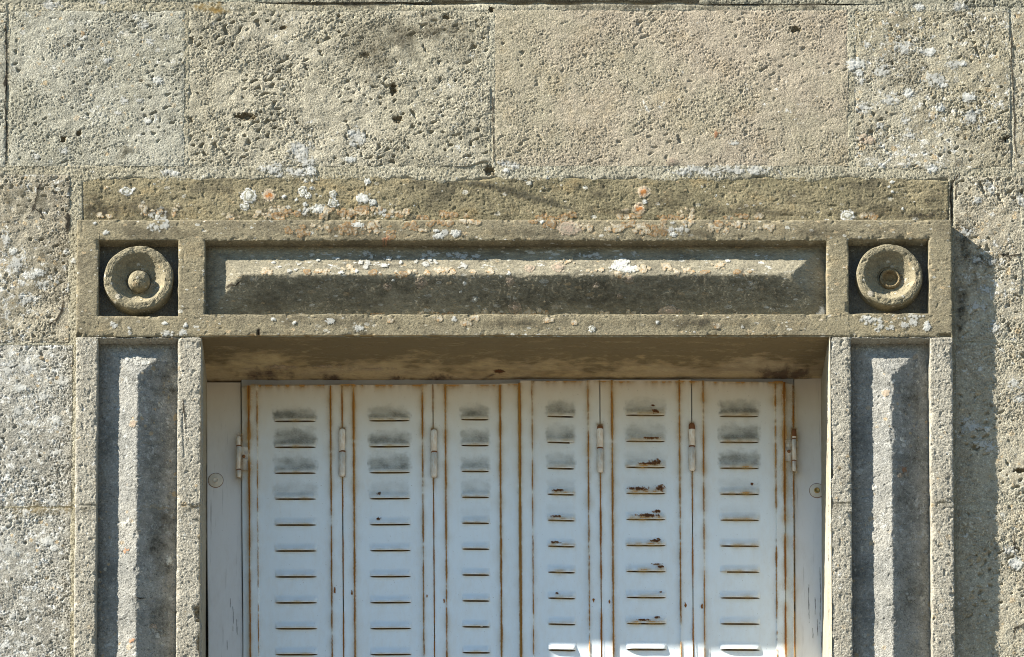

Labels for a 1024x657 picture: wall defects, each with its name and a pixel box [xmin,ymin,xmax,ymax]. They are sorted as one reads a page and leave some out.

damp [198,319,832,380]
corrosion [237,384,393,657]
corrosion [480,369,577,657]
corrosion [627,484,665,492]